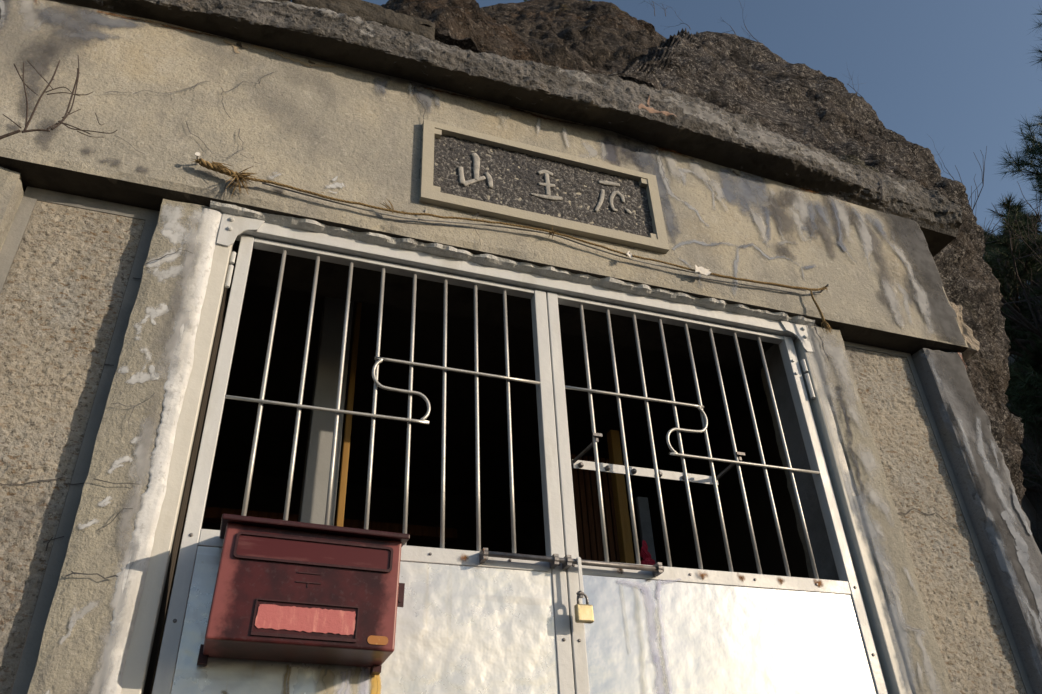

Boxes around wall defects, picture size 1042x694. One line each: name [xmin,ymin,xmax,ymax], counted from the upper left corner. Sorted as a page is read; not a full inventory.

water stain [9,0,138,130]
peeling [118,303,169,384]
peeling [108,437,142,473]
water stain [585,136,1042,694]